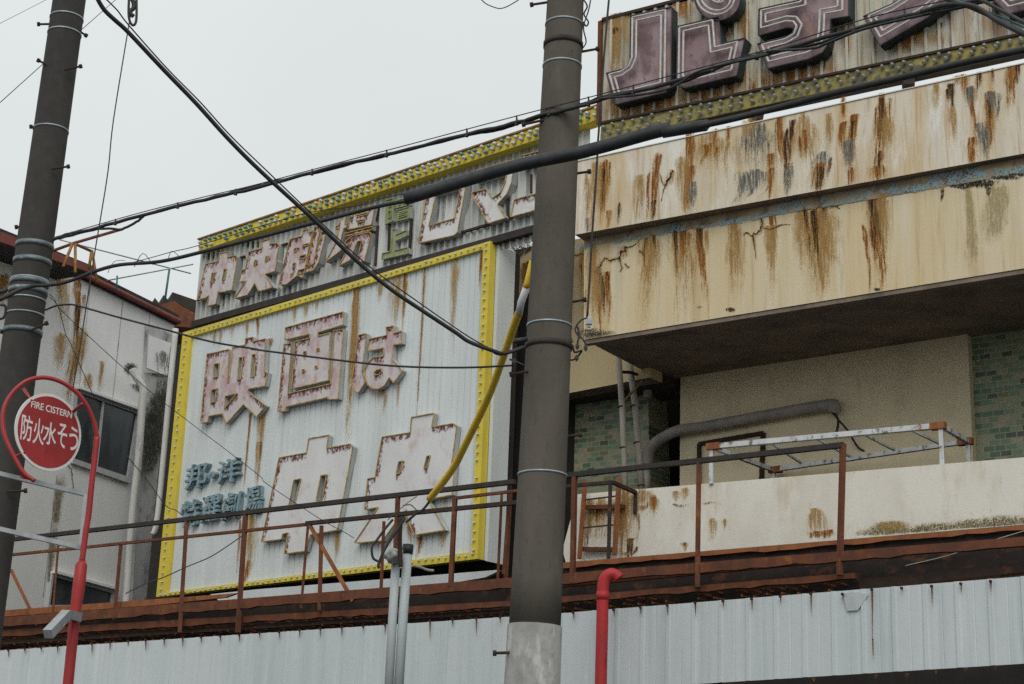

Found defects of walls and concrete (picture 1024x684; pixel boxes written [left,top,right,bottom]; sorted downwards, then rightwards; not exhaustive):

corrosion [636,153,662,218]
crack [660,170,674,201]
corrosion [675,126,730,208]
corrosion [767,96,859,197]
corrosion [870,93,893,179]
corrosion [933,64,1020,162]
crack [574,240,644,280]
corrosion [668,228,709,296]
crack [743,205,840,257]
corrosion [862,193,889,289]
corrosion [55,278,104,397]
leakage [856,515,1024,535]